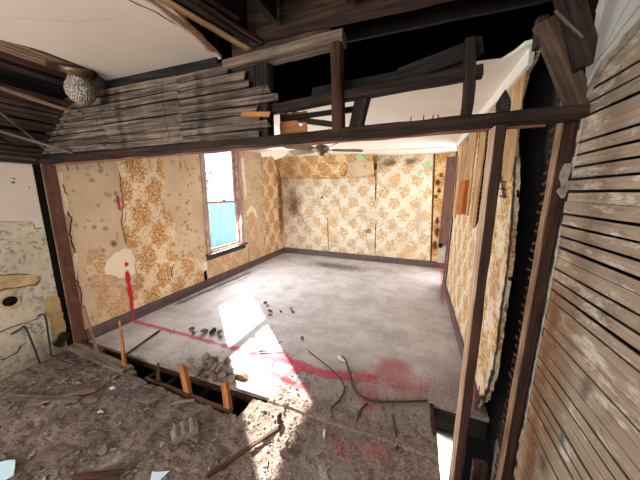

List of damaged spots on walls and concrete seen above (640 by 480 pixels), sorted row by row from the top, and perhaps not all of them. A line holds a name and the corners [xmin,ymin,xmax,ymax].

flaking render [0,274,41,309]
flaking render [104,248,135,278]
flaking render [478,152,520,405]